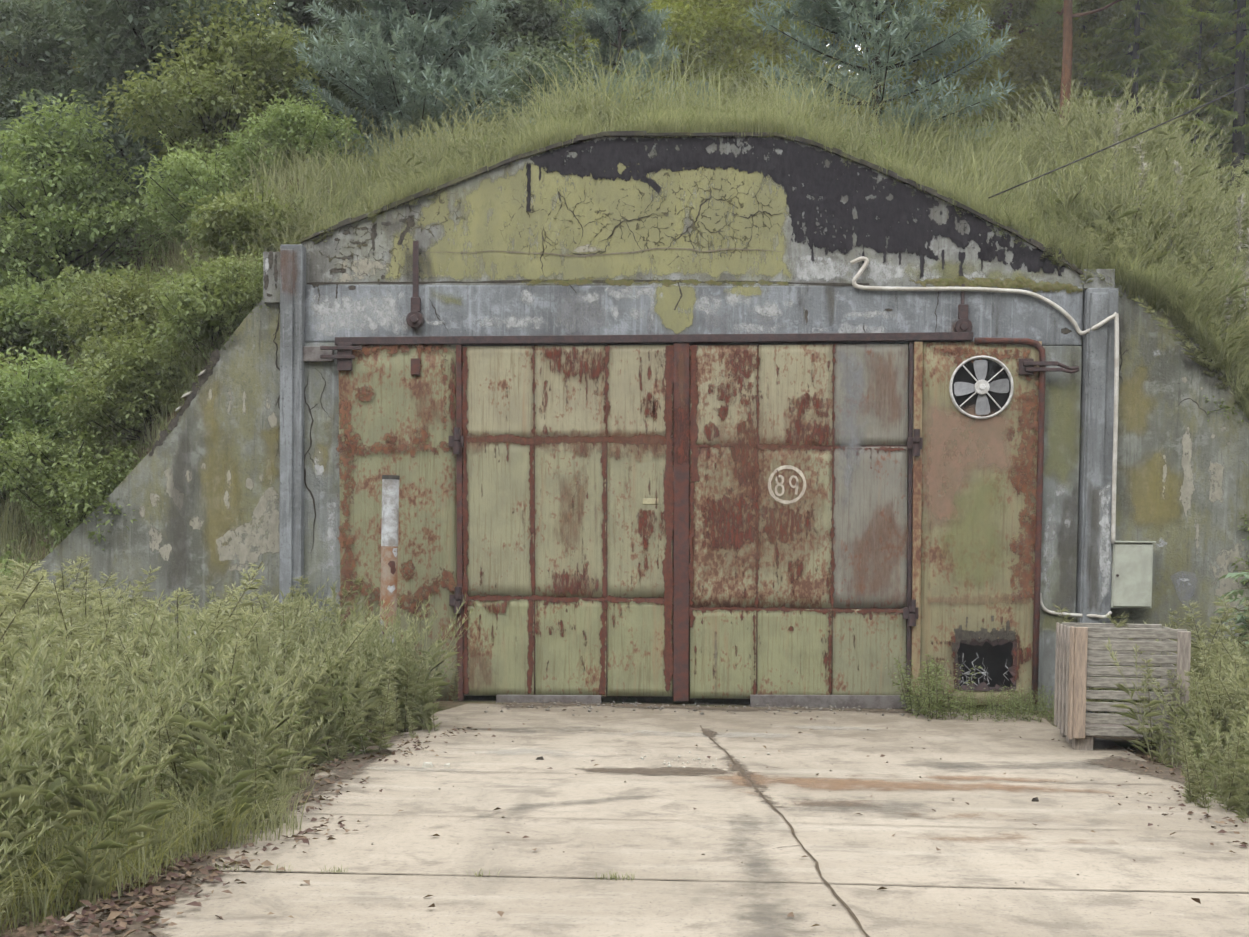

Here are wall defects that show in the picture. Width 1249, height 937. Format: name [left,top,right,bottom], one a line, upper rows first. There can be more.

crack [307,169,869,330]
peeling [312,163,943,297]
peeling [139,463,206,561]
peeling [216,459,280,571]
crack [273,303,331,551]
rust [336,344,457,622]
rust [535,346,609,456]
rust [622,470,664,584]
rust [701,346,832,599]
leakage [1119,367,1151,432]
leakage [1130,426,1224,553]
crack [700,725,870,937]